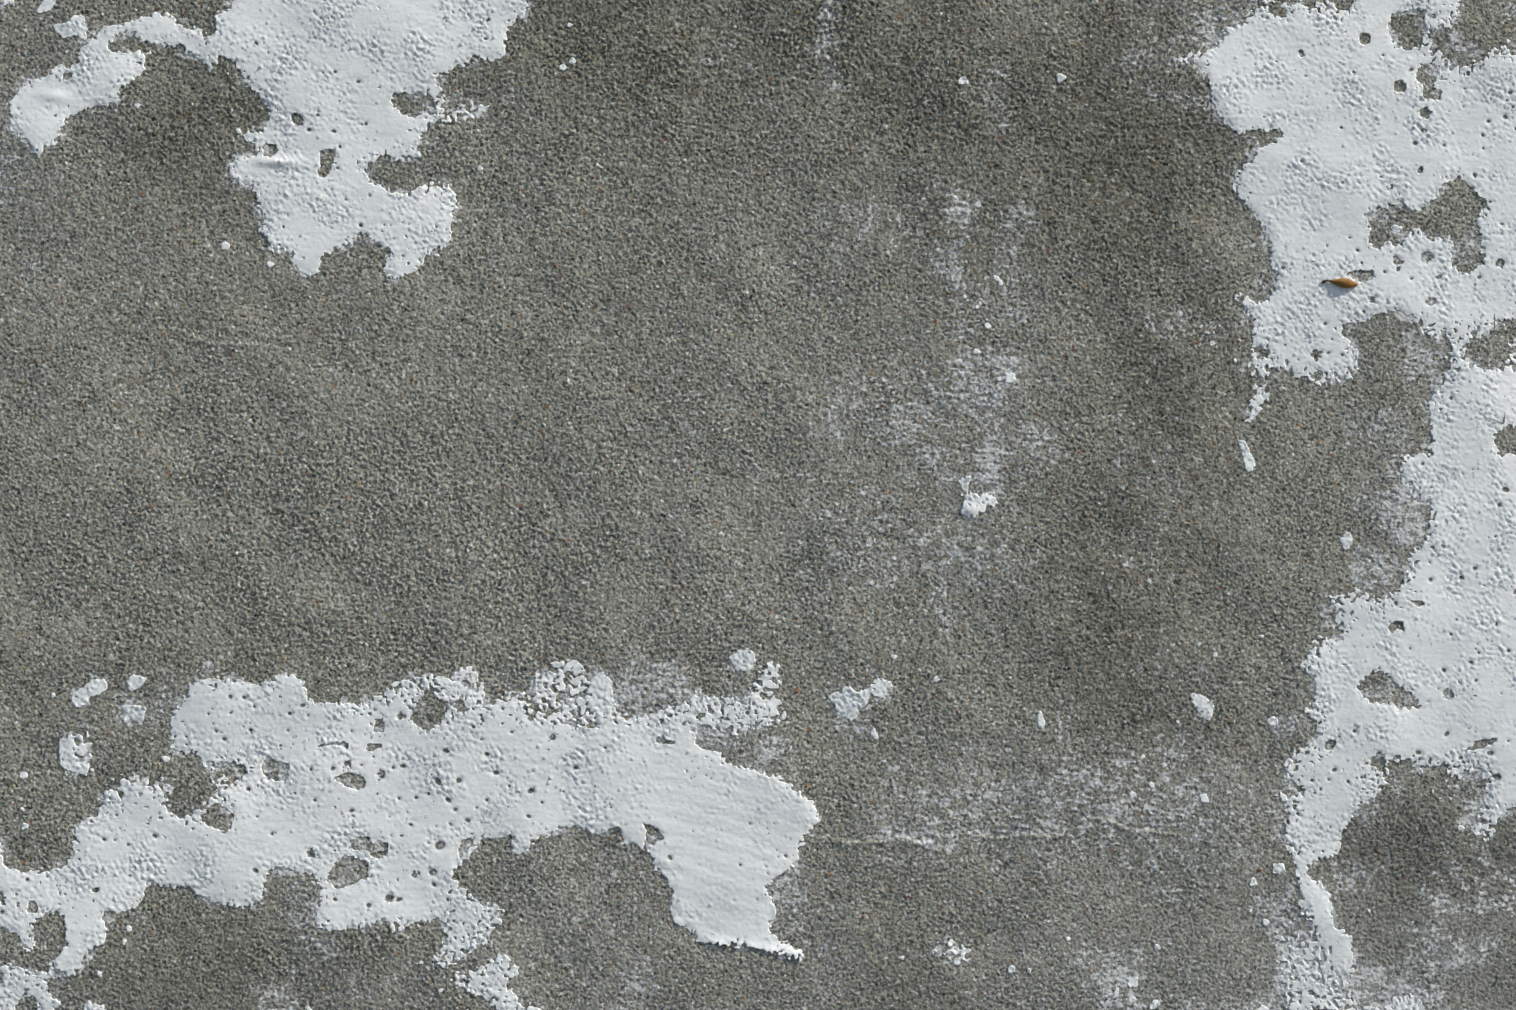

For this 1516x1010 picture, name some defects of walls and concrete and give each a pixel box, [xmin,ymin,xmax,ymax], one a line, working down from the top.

peeling [9,0,534,289]
peeling [0,367,1204,1010]
peeling [928,0,1516,1010]